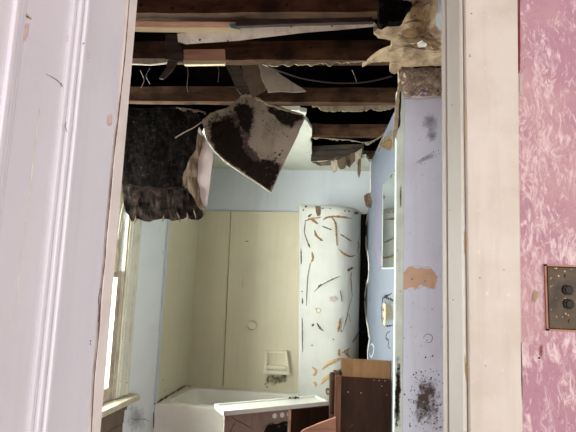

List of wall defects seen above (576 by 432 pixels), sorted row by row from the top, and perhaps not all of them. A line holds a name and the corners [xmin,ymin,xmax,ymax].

spalling [397,66,442,99]
water stain [262,100,303,137]
water stain [208,100,283,191]
peeling [404,266,438,290]
water stain [394,359,443,430]